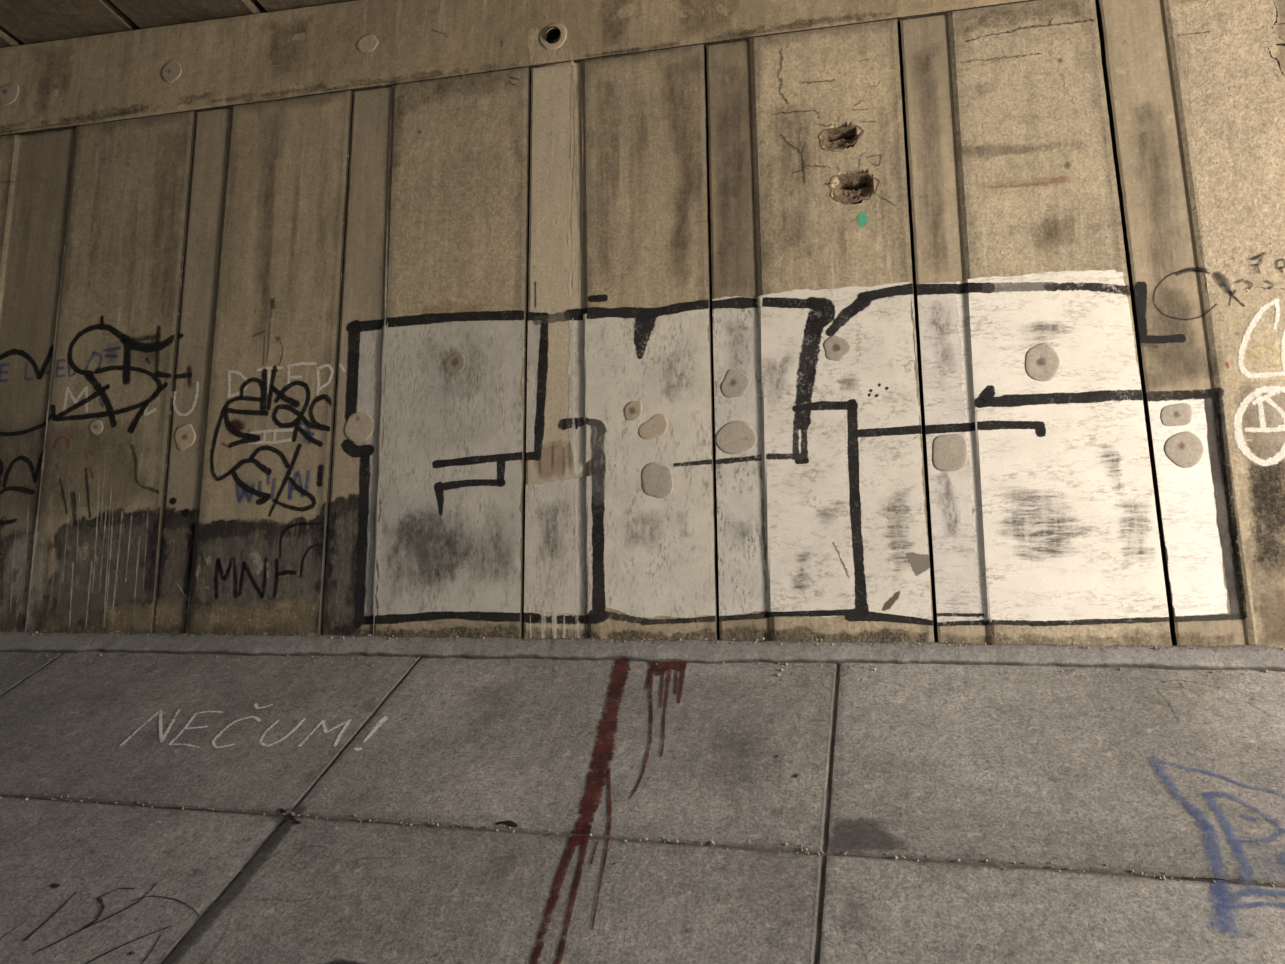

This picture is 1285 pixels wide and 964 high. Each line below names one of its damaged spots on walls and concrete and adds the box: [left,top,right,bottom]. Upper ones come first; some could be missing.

crack [777,50,820,179]
spalling [815,121,897,206]
flaking render [1186,0,1285,293]
damp [1251,462,1285,566]
damp [9,516,315,634]